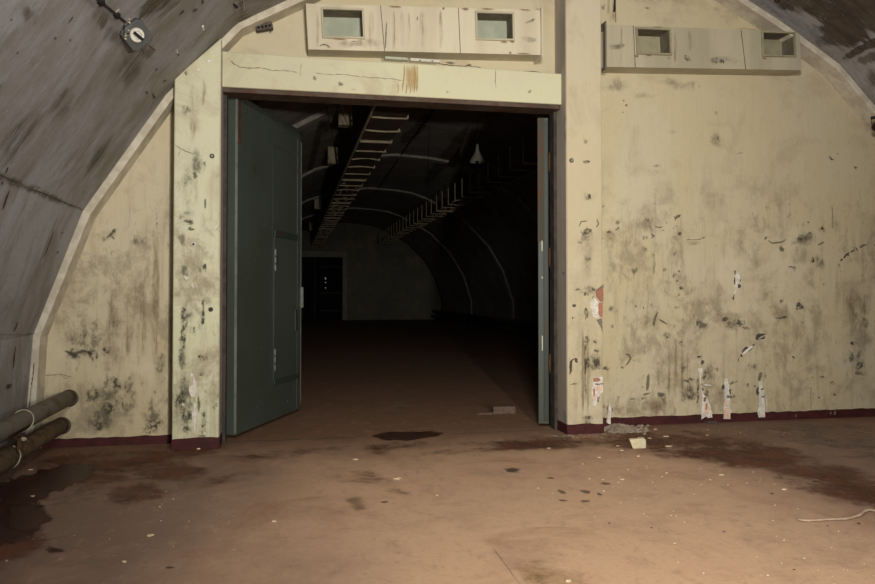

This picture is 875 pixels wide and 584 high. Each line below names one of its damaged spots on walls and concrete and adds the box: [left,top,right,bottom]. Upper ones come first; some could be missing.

damp [140,0,171,17]
damp [776,0,875,85]
corrosion [398,67,418,92]
spalling [590,284,604,332]
damp [66,334,109,359]
damp [179,300,205,365]
peeling [738,334,765,361]
damp [87,378,131,431]
damp [176,386,206,437]
spalling [591,376,613,424]
spalling [697,356,737,419]
spalling [755,372,767,418]